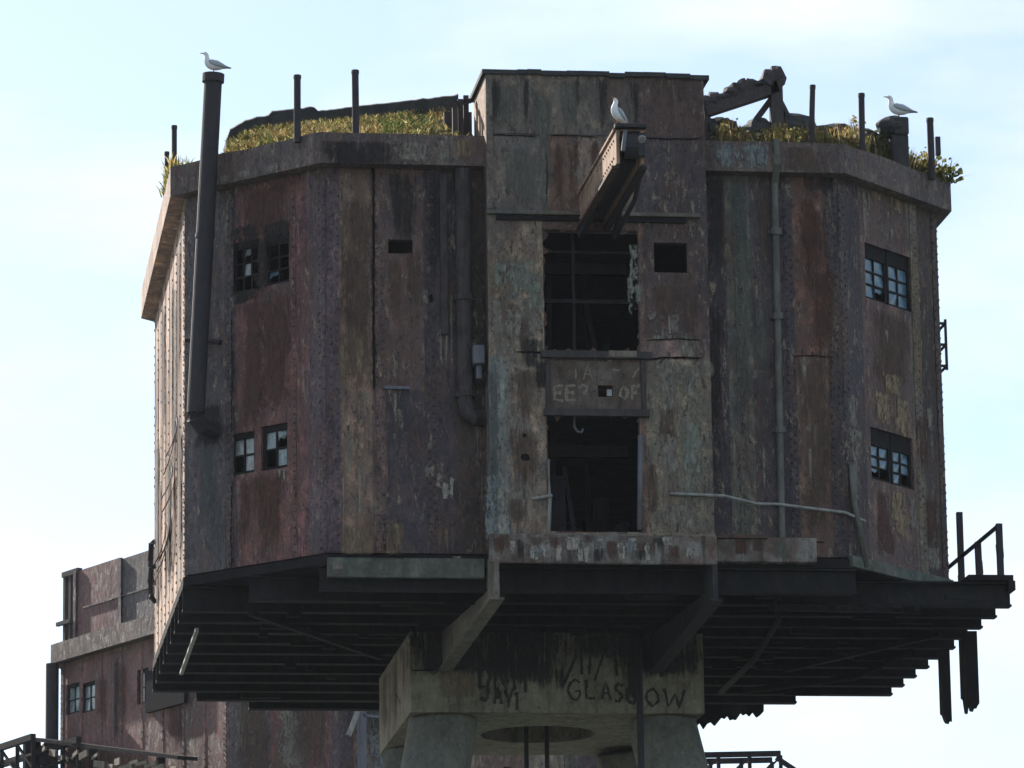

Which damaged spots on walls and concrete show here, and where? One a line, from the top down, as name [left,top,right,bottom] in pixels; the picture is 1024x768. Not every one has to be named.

peeling [424,466,454,499]
peeling [529,531,715,563]
leakage [405,626,698,700]